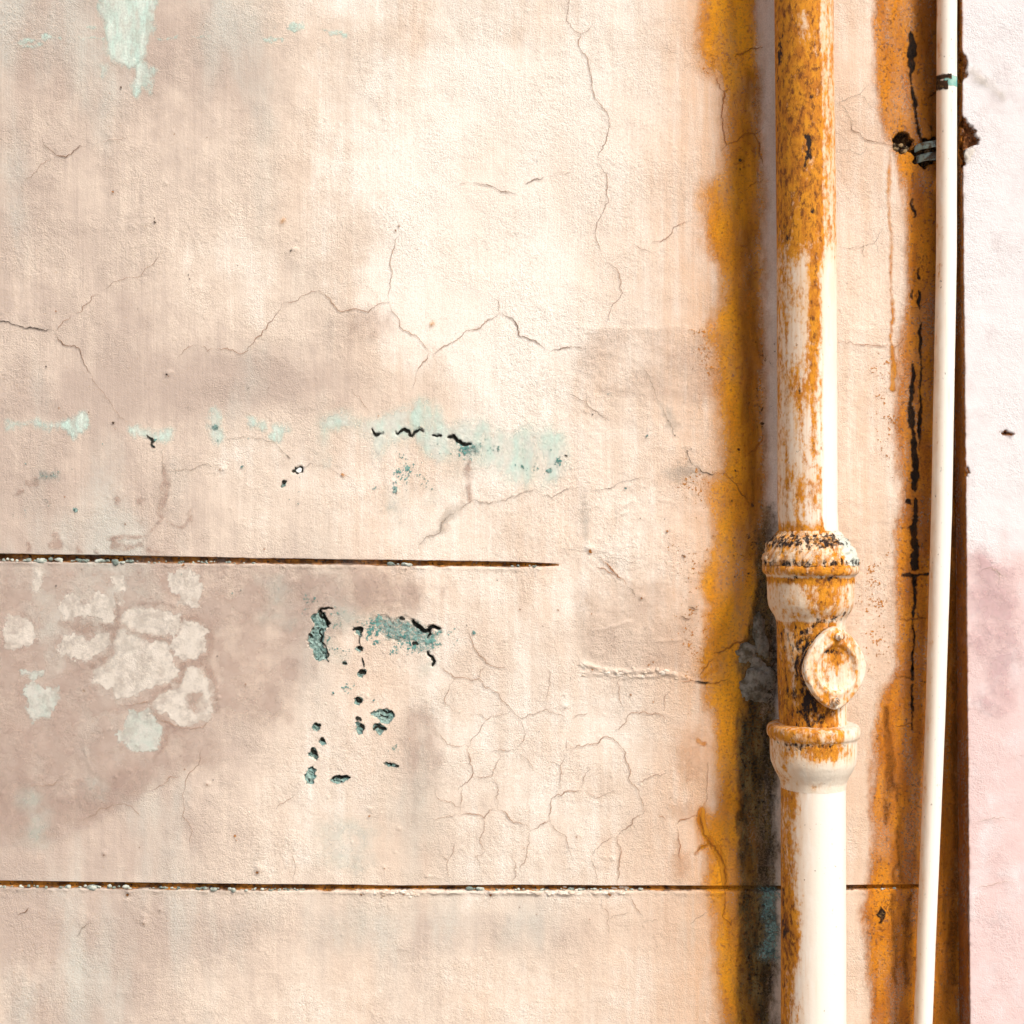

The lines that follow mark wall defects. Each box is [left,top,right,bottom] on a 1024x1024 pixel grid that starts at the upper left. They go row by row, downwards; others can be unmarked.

peeling [91,0,160,97]
crack [566,0,623,307]
crack [0,259,157,419]
crack [184,246,582,380]
peeling [369,401,567,494]
rust [667,0,765,1024]
rust [855,0,937,1024]
flaking render [302,594,458,735]
flaking render [305,723,326,784]
flaking render [330,775,351,784]
crack [436,637,740,925]
leakage [732,507,781,1024]